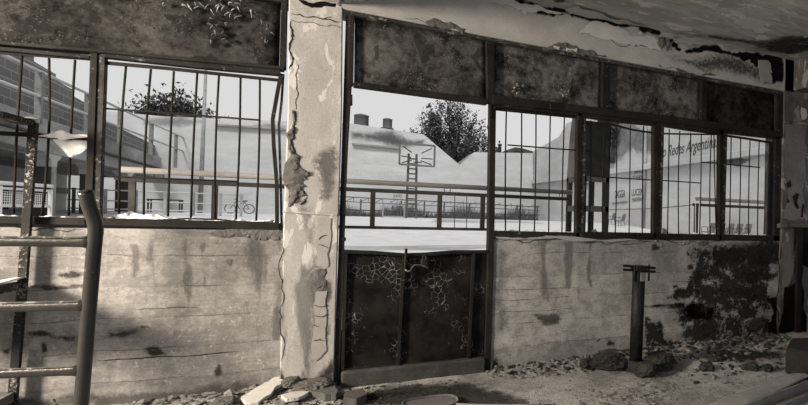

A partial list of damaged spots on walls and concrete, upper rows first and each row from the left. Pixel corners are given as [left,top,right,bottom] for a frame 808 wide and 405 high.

spalling [425,18,466,34]
peeling [482,0,662,51]
spalling [548,42,609,57]
peeling [670,35,746,53]
peeling [758,60,773,84]
spalling [283,110,310,207]
peeling [783,107,808,221]
spalling [314,268,327,290]
water stain [644,241,779,347]
peeling [782,241,808,312]